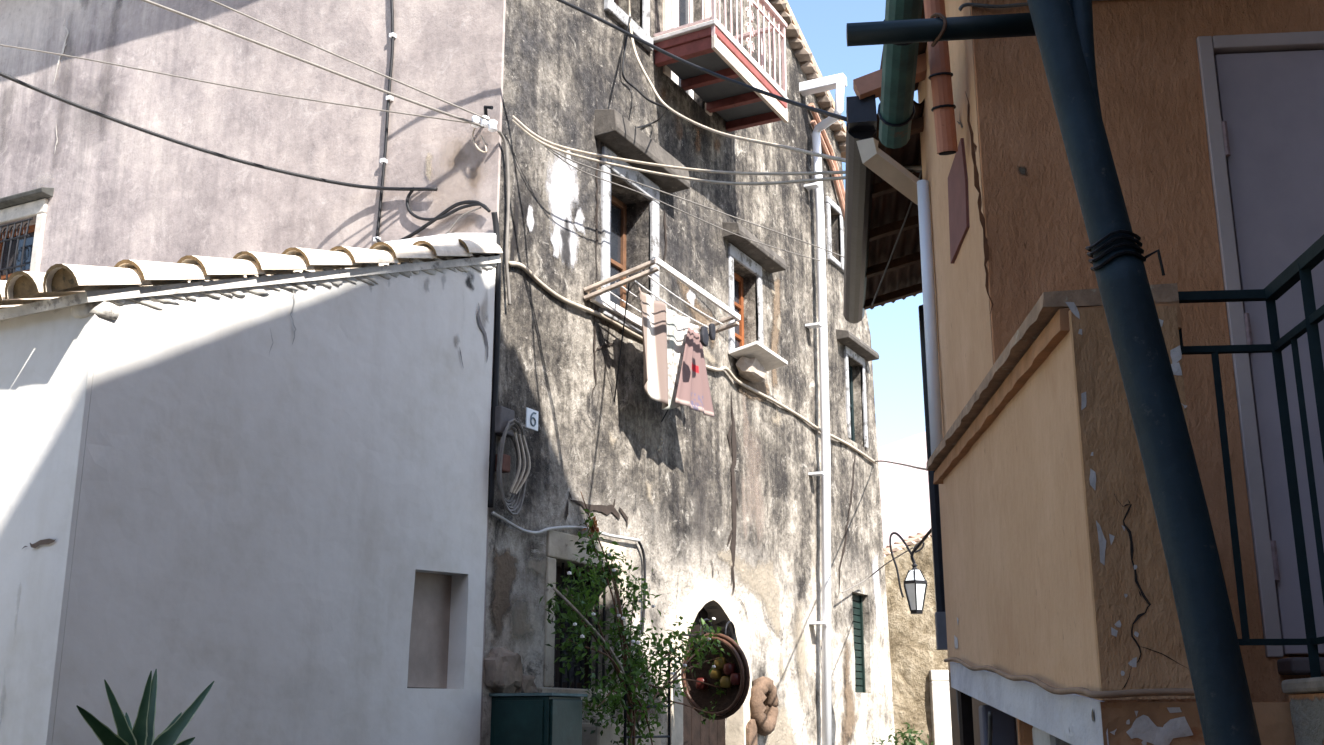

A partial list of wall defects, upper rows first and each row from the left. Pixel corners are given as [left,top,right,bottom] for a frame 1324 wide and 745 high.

peeling [1170,346,1182,375]
peeling [1096,521,1125,565]
crack [1114,494,1185,689]
peeling [1110,707,1193,745]
spalling [1290,697,1324,745]